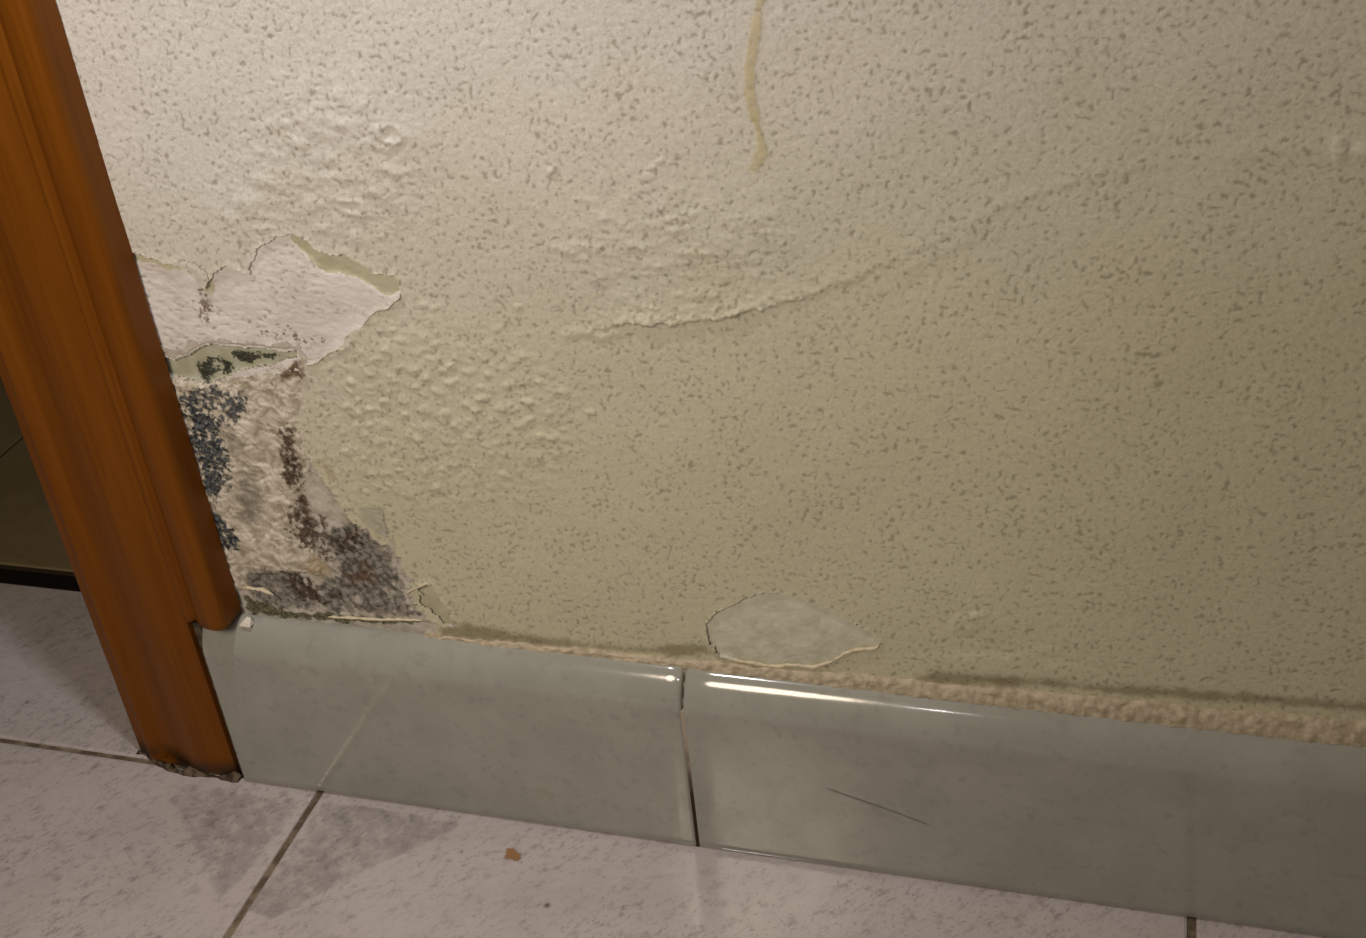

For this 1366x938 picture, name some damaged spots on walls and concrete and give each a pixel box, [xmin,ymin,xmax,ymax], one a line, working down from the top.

water stain [192,288,218,326]
water stain [179,351,303,551]
spalling [130,227,460,634]
water stain [244,427,429,624]